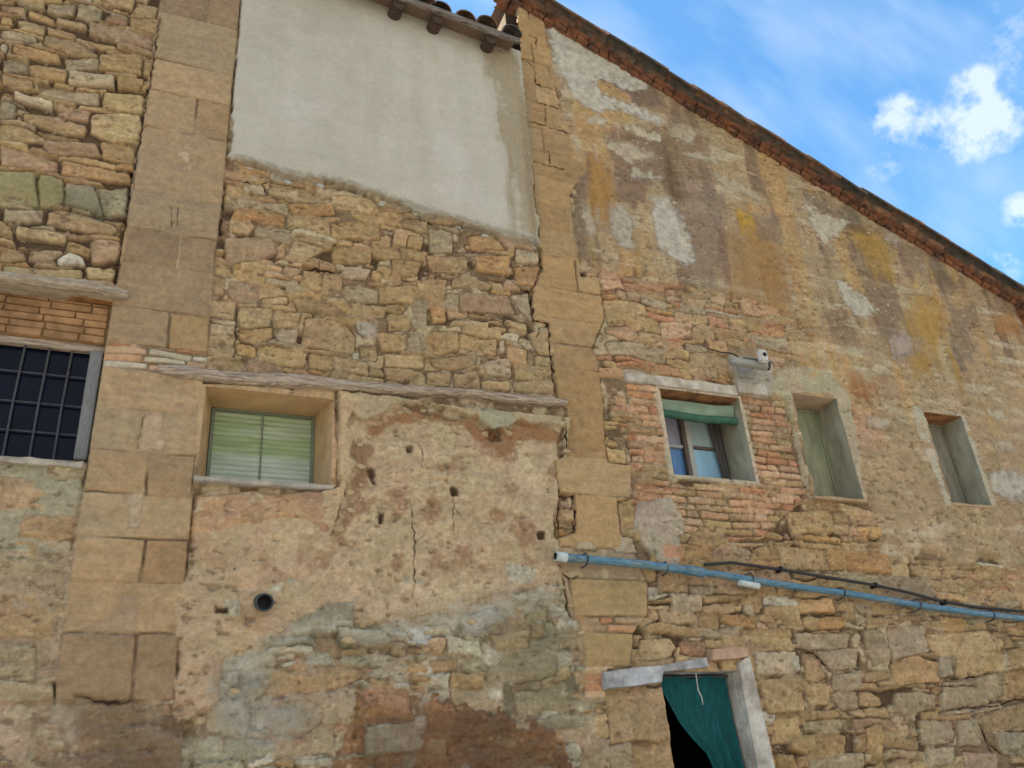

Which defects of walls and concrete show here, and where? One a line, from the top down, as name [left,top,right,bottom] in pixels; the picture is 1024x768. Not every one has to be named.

peeling [546,27,762,202]
peeling [581,205,635,248]
peeling [652,196,695,266]
crack [517,249,557,397]
spalling [333,409,570,532]
spalling [222,587,553,694]